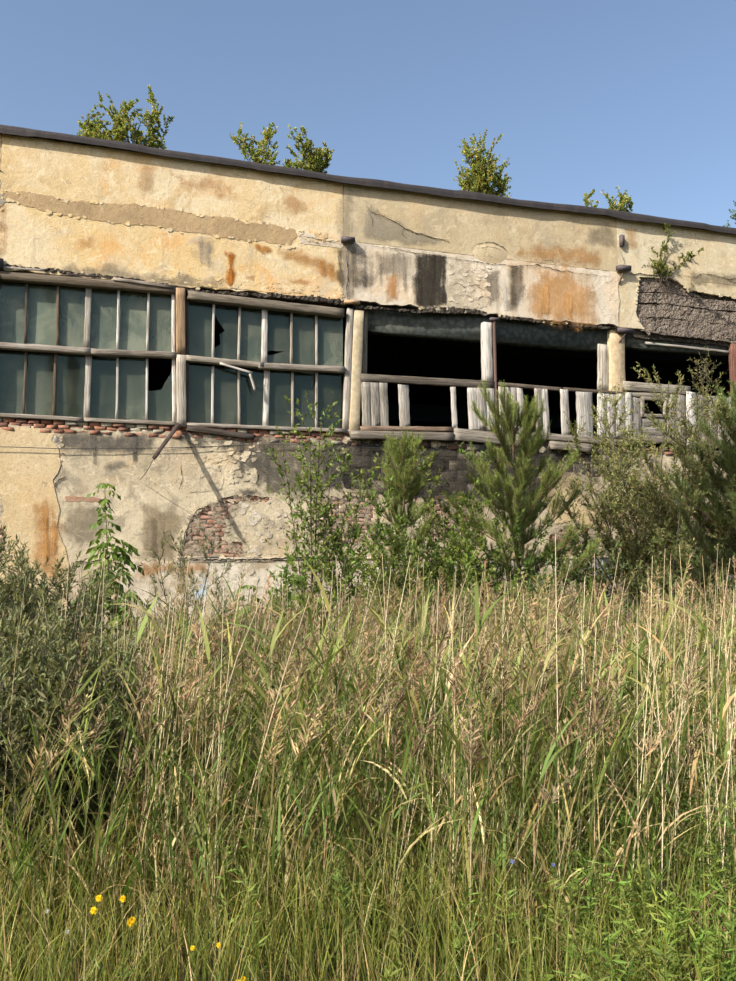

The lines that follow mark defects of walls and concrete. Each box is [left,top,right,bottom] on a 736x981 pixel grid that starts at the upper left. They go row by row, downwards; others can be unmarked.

flaking render [0,190,343,250]
rust [225,252,235,286]
water stain [364,209,447,308]
water stain [487,267,522,310]
crack [304,205,735,321]
rust [517,248,599,325]
spalling [633,278,736,347]
spalling [172,436,621,610]